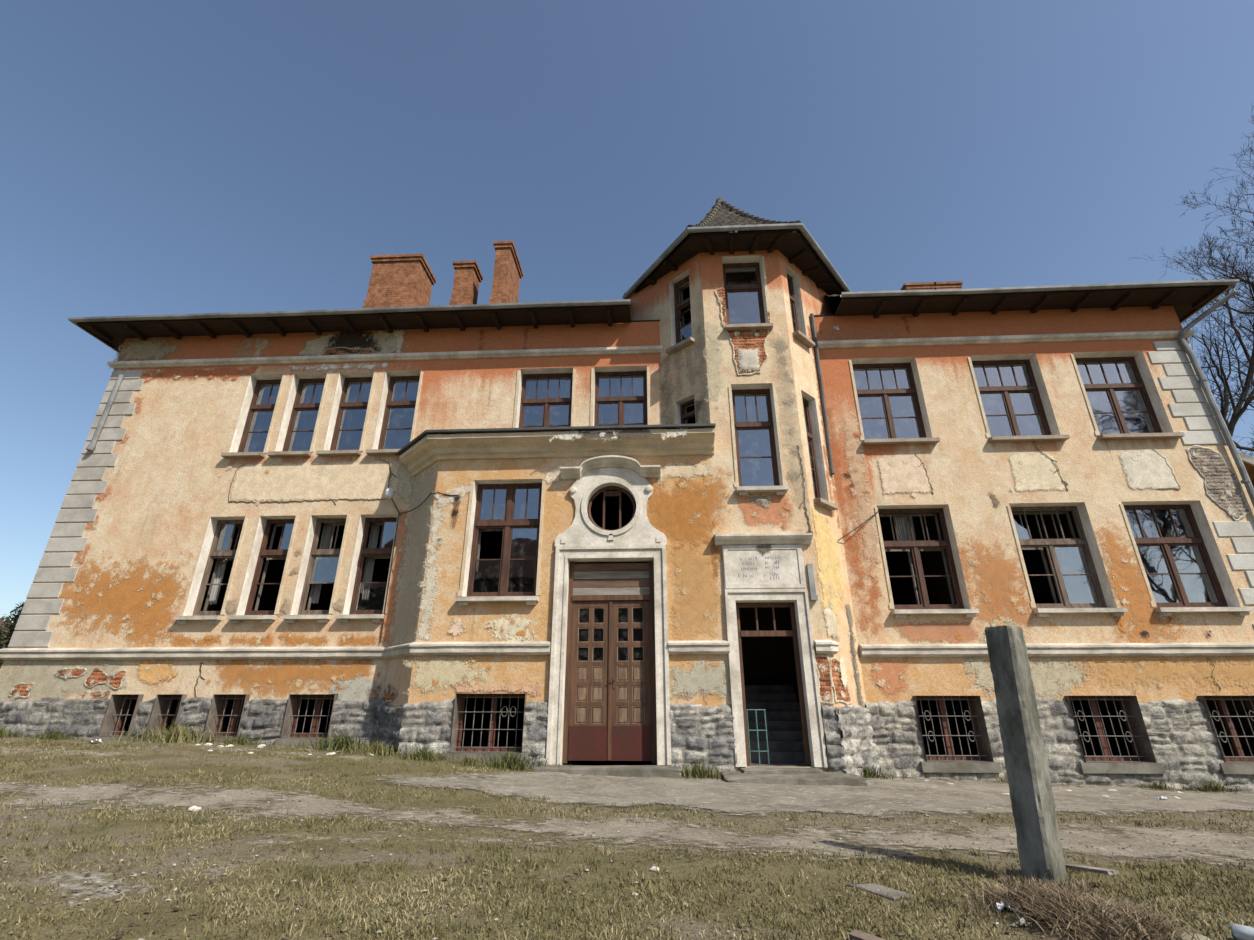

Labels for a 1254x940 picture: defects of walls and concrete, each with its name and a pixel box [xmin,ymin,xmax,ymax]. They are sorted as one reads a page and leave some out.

flaking render [549,287,794,442]
crack [194,662,206,696]
peeling [53,483,542,705]
peeling [646,461,793,641]
peeling [807,508,909,708]
peeling [844,413,881,578]
flaking render [1187,445,1251,522]